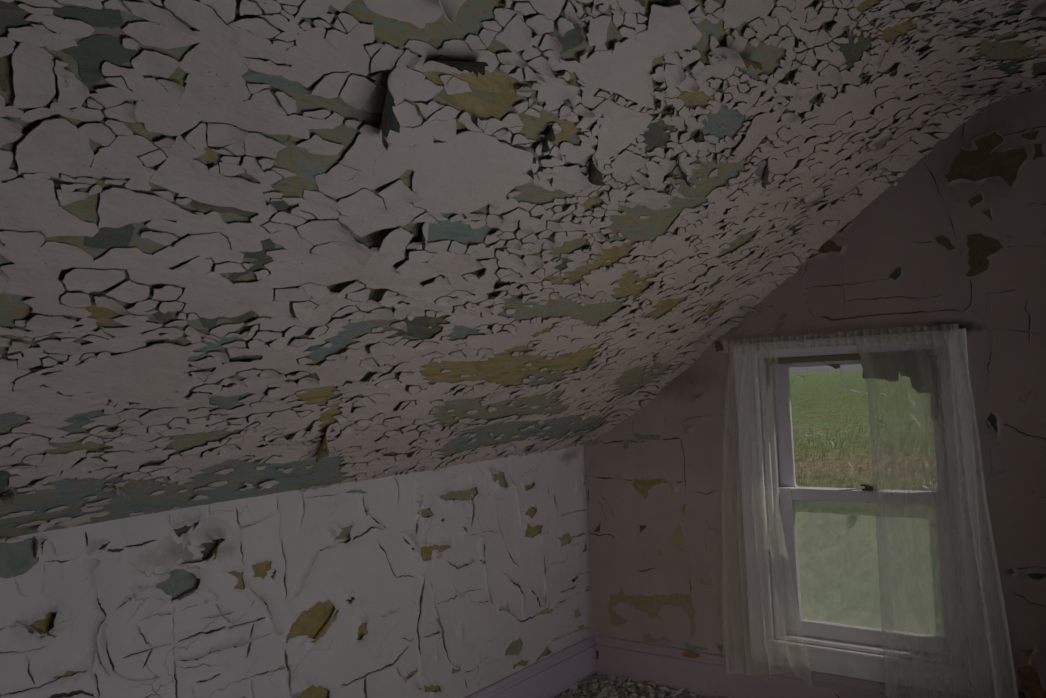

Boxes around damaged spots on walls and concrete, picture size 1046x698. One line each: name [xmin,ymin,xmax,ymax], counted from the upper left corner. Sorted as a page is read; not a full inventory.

peeling [0,0,1046,495]
crack [586,414,723,522]
peeling [413,481,481,528]
peeling [520,479,545,542]
peeling [145,507,279,607]
crack [0,476,591,698]
peeling [415,536,454,568]
peeling [2,595,71,649]
peeling [283,590,371,654]
peeling [289,672,335,698]
peeling [1013,663,1046,698]